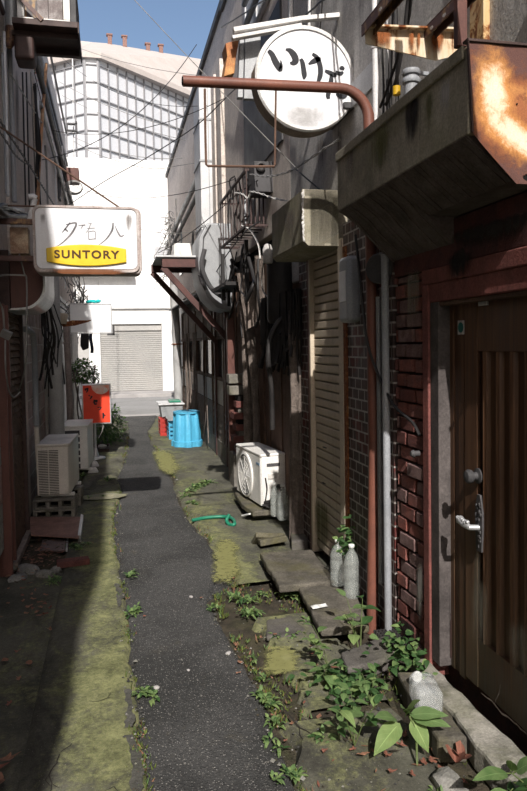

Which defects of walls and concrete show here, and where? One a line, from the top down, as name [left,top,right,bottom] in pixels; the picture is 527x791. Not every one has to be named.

rust [375,31,390,44]
rust [431,34,443,50]